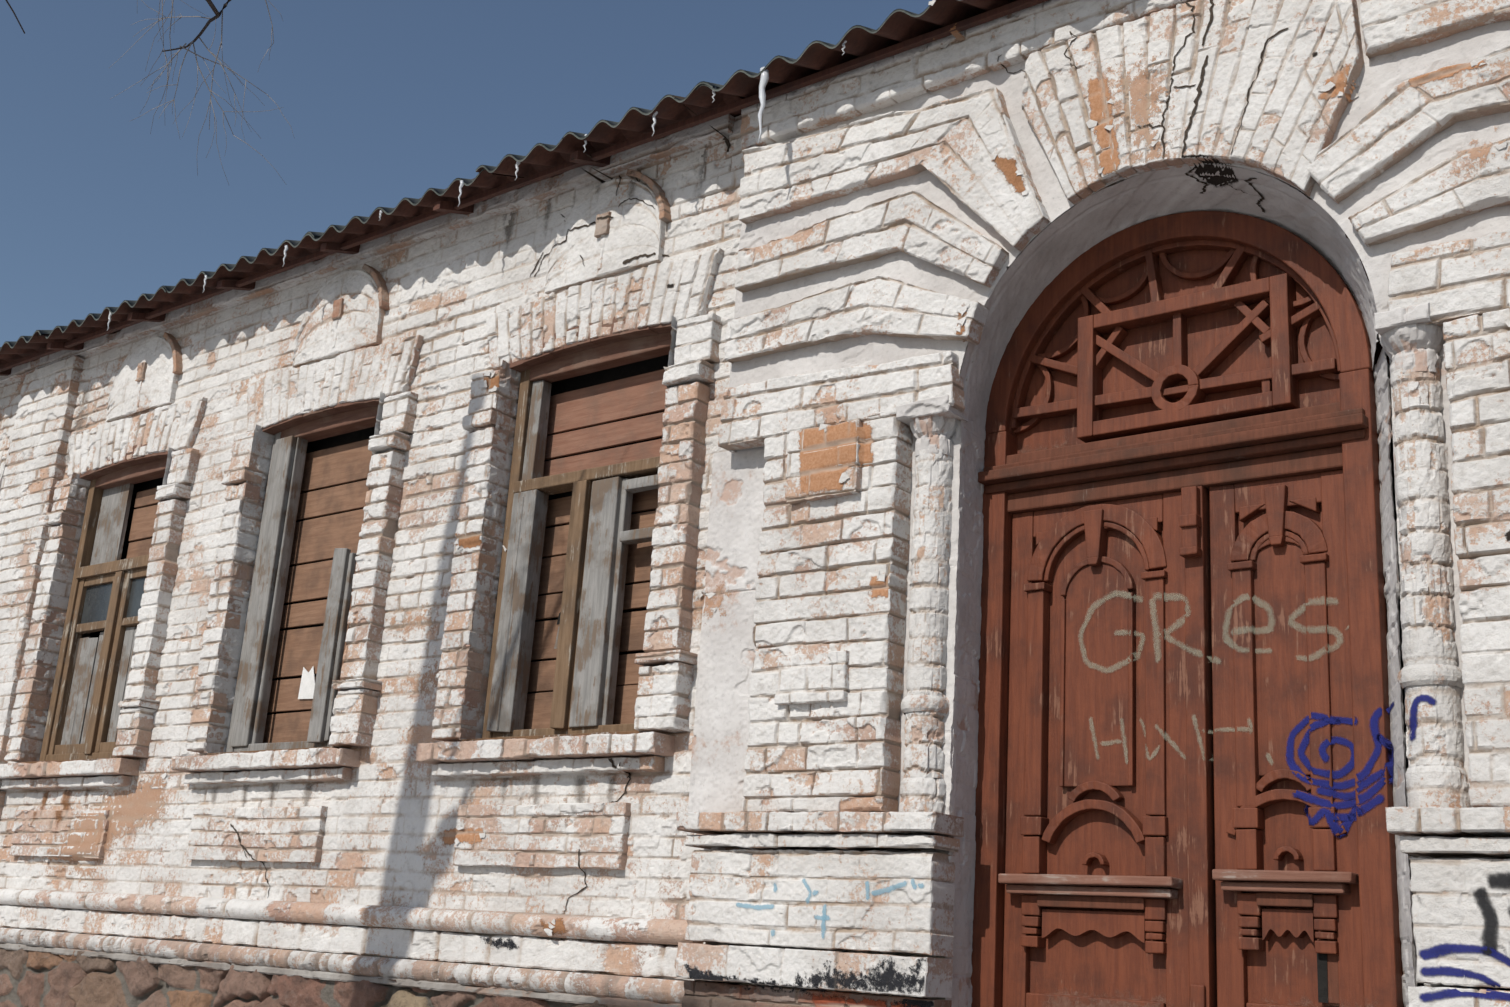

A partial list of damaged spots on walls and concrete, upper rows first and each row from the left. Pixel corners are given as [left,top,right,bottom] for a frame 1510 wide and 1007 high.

spalling [1086,49,1180,177]
crack [1137,0,1288,213]
spalling [992,154,1028,196]
spalling [798,421,874,494]
crack [230,824,270,898]
crack [564,849,587,912]
spalling [808,994,925,1007]